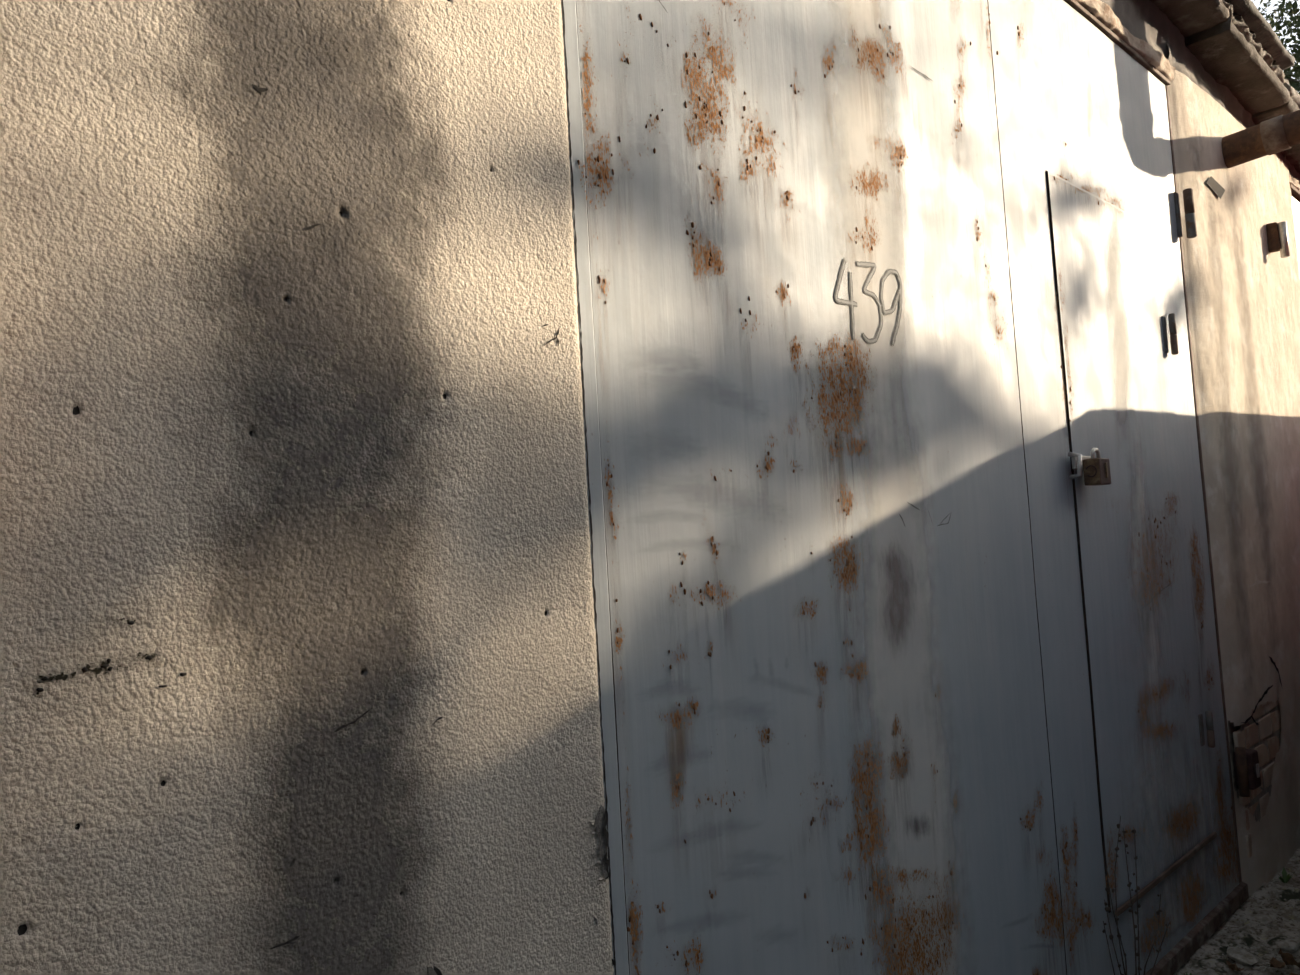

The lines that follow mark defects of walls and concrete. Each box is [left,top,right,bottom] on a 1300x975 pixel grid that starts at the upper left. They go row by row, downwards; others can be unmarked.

rust [577,0,787,209]
rust [823,0,907,86]
rust [686,218,725,282]
rust [849,136,910,253]
rust [747,332,877,478]
rust [603,459,619,539]
rust [670,580,741,610]
rust [828,483,864,611]
damp [838,0,958,975]
rust [800,715,970,975]
rust [1029,793,1096,973]
flaking render [1233,697,1281,858]